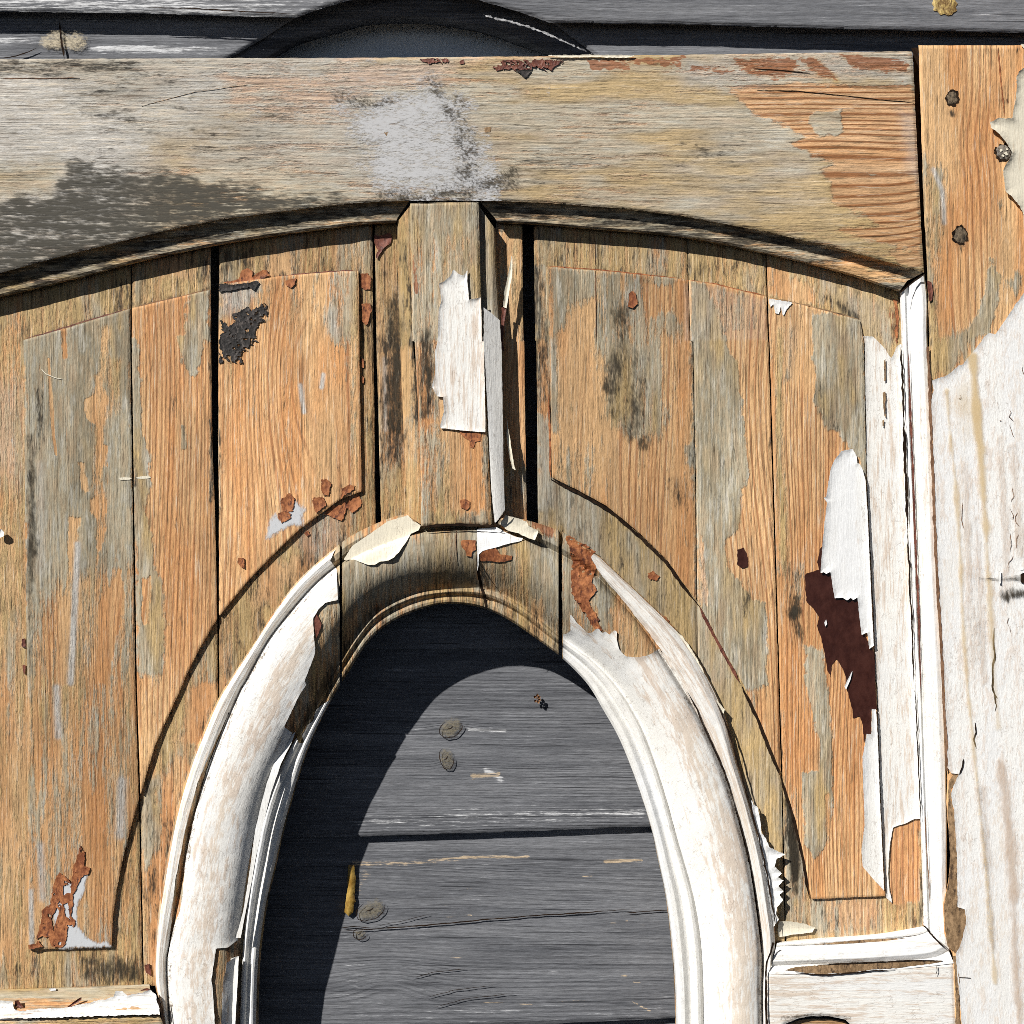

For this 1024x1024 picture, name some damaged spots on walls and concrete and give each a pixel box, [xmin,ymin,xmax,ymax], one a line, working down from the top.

peeling [0,515,420,1024]
peeling [432,256,538,571]
peeling [548,397,815,1024]
peeling [804,299,920,902]
peeling [931,293,1024,1024]